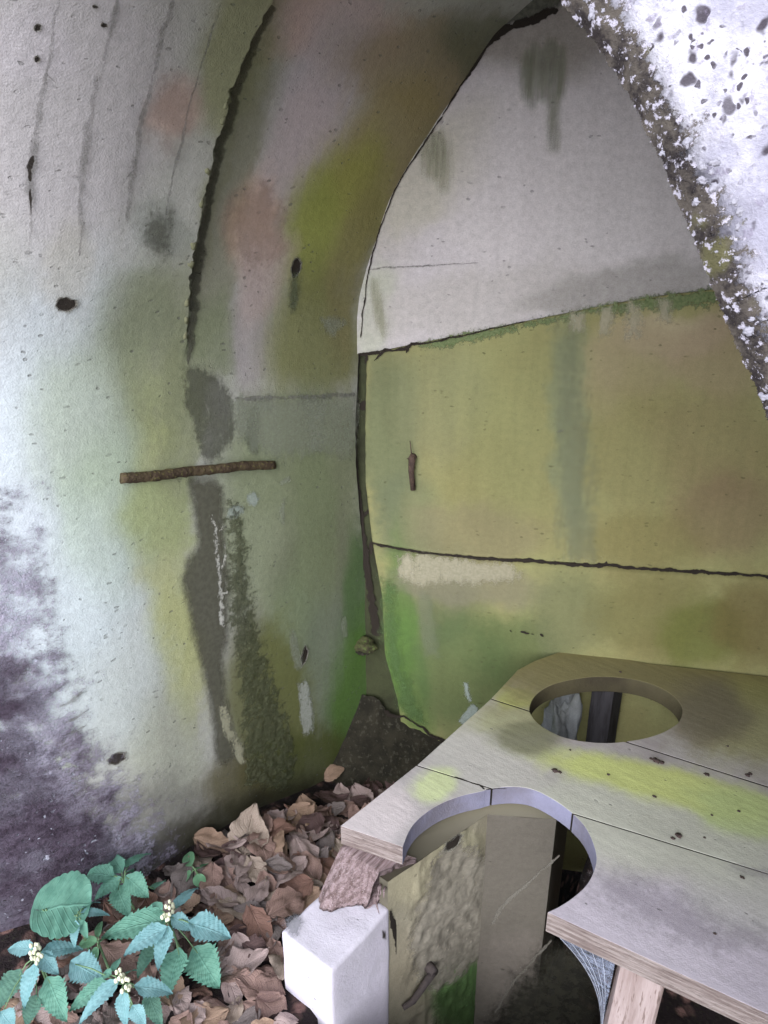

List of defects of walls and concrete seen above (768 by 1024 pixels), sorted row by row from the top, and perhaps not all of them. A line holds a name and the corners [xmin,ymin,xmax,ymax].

water stain [185,368,234,458]
crack [246,321,768,636]
water stain [182,480,243,763]